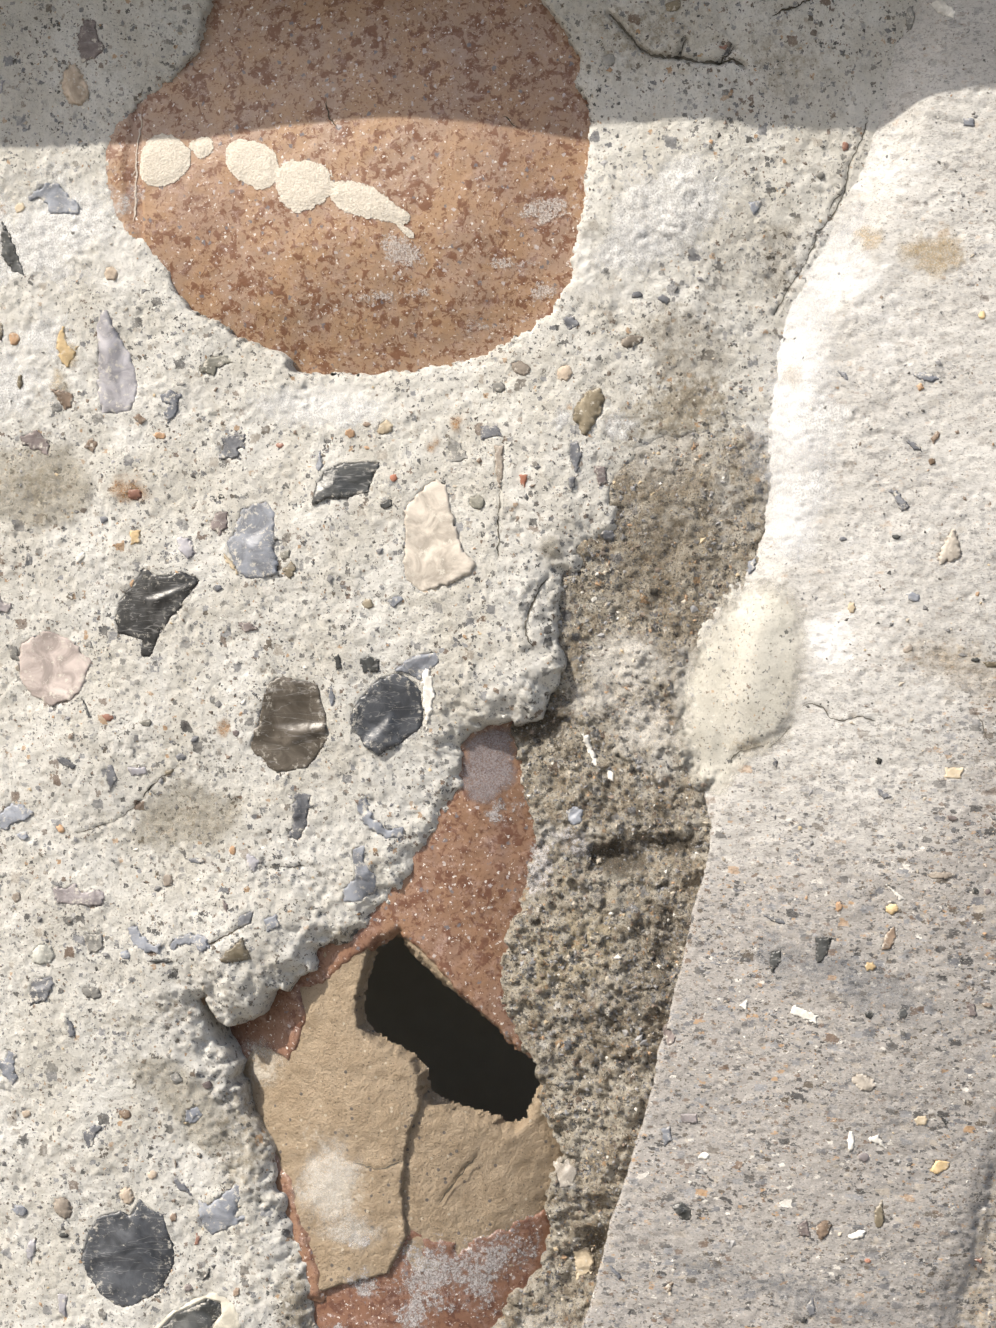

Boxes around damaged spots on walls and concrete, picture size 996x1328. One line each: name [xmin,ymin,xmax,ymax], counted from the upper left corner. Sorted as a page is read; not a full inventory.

crack [609,14,745,67]
spalling [563,316,579,330]
spalling [480,425,503,441]
leakage [605,415,635,439]
leakage [593,644,673,746]
leakage [486,795,524,822]
leakage [524,827,643,894]
spalling [490,418,773,1328]